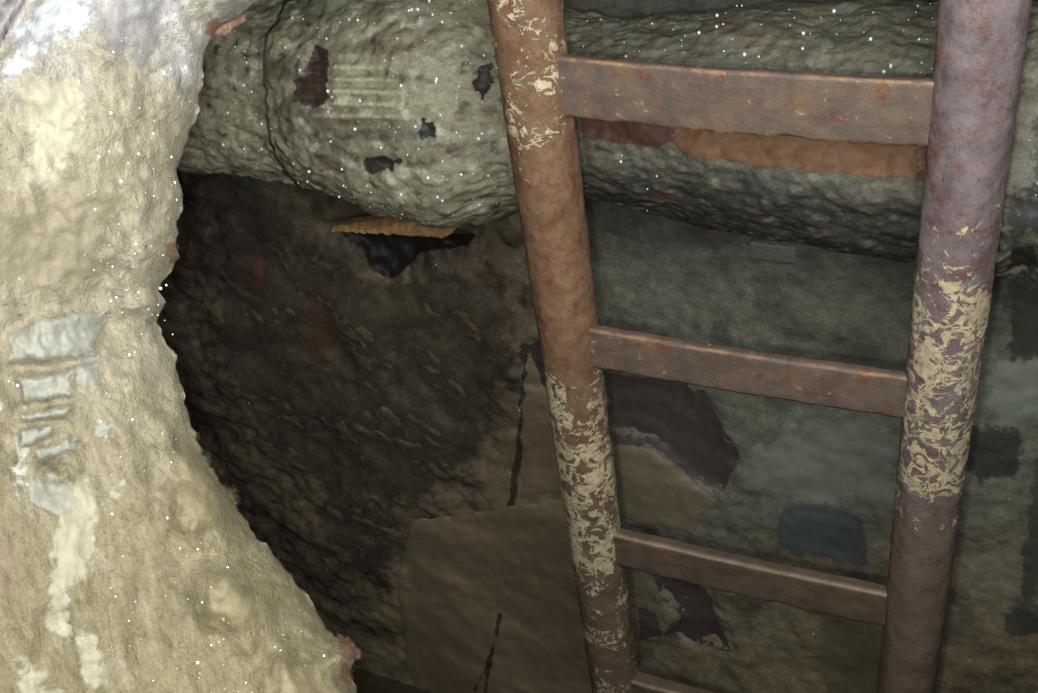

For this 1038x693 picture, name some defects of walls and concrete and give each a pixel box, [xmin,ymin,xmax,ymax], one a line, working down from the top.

water stain [1,0,95,189]
spalling [294,45,329,108]
spalling [342,232,475,278]
water stain [12,436,29,485]
crack [507,403,524,507]
spalling [604,371,739,535]
water stain [738,408,898,565]
water stain [1005,460,1038,636]
crack [474,613,502,693]